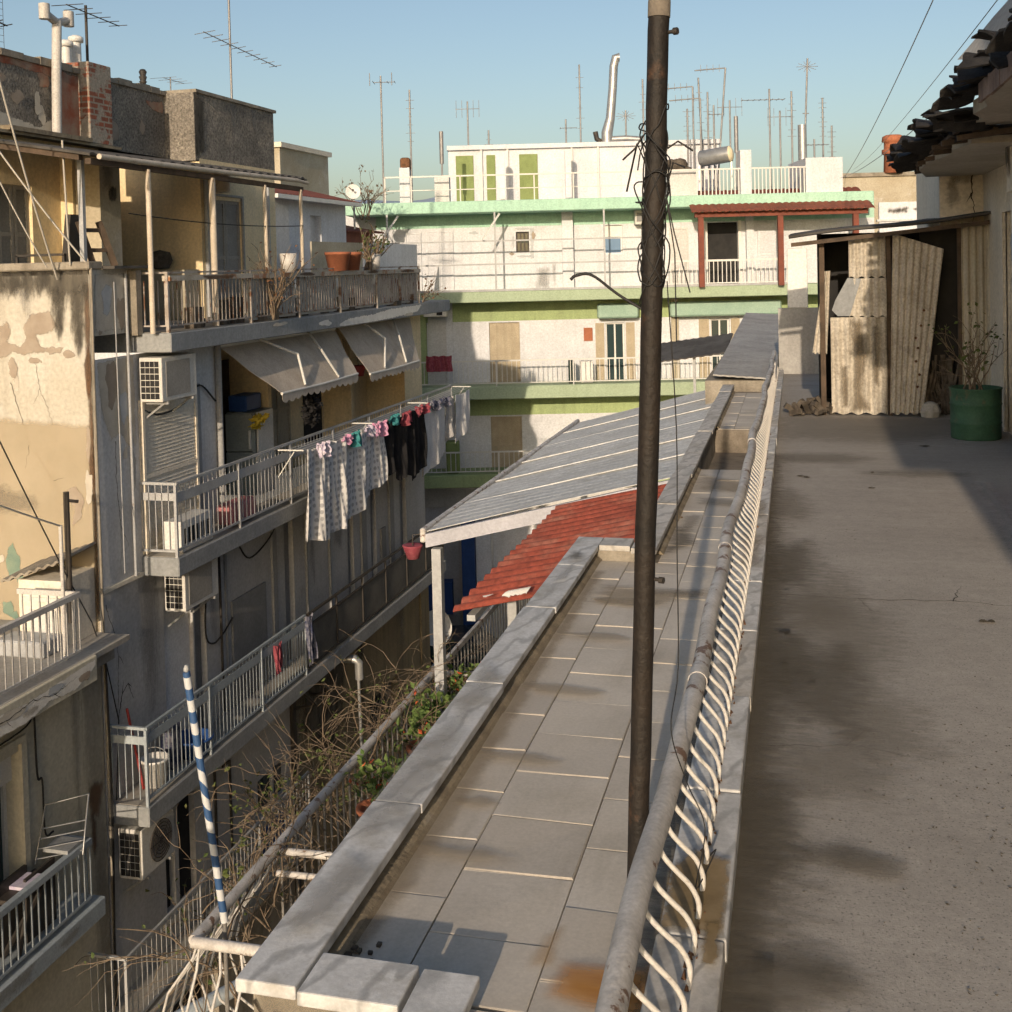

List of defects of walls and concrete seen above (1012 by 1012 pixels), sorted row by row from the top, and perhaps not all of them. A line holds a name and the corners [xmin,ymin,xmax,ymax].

flaking render [0,55,80,136]
peeling [0,311,75,392]
water stain [0,270,89,353]
rust [724,617,746,726]
water stain [637,489,854,1012]
rust [681,894,706,992]
rust [556,968,604,1004]
rust [628,972,644,1012]